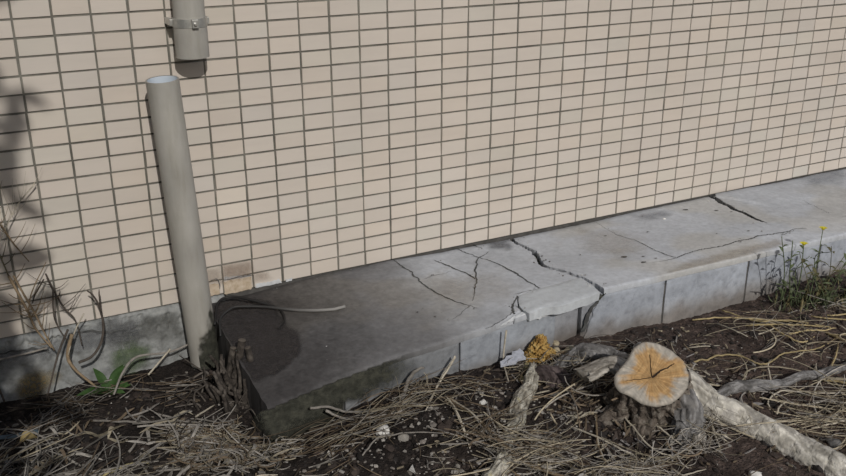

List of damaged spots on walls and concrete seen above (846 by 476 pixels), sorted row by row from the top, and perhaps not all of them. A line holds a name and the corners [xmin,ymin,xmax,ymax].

crack [596,195,800,262]
leakage [217,301,300,380]
crack [392,244,541,328]
crack [581,293,606,332]